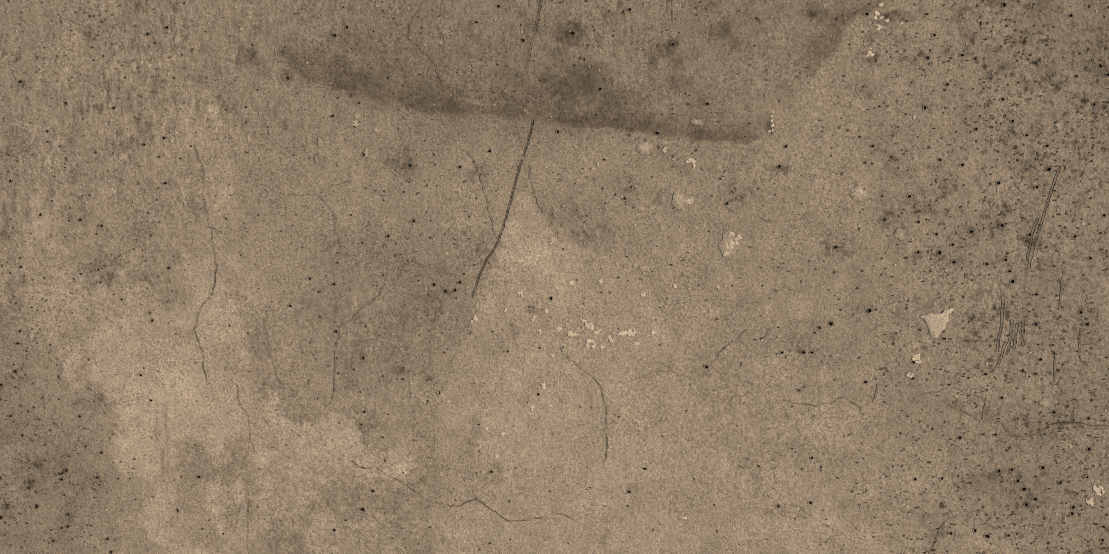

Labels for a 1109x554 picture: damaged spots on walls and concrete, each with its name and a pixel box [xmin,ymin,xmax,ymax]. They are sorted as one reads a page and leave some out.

leakage [274,0,881,150]
crack [193,144,222,382]
crack [236,383,256,454]
crack [306,260,455,399]
leakage [14,75,904,554]
crack [346,460,583,522]
crack [466,121,544,297]
crack [560,327,780,469]
leakage [885,459,933,507]
spalling [920,308,954,338]